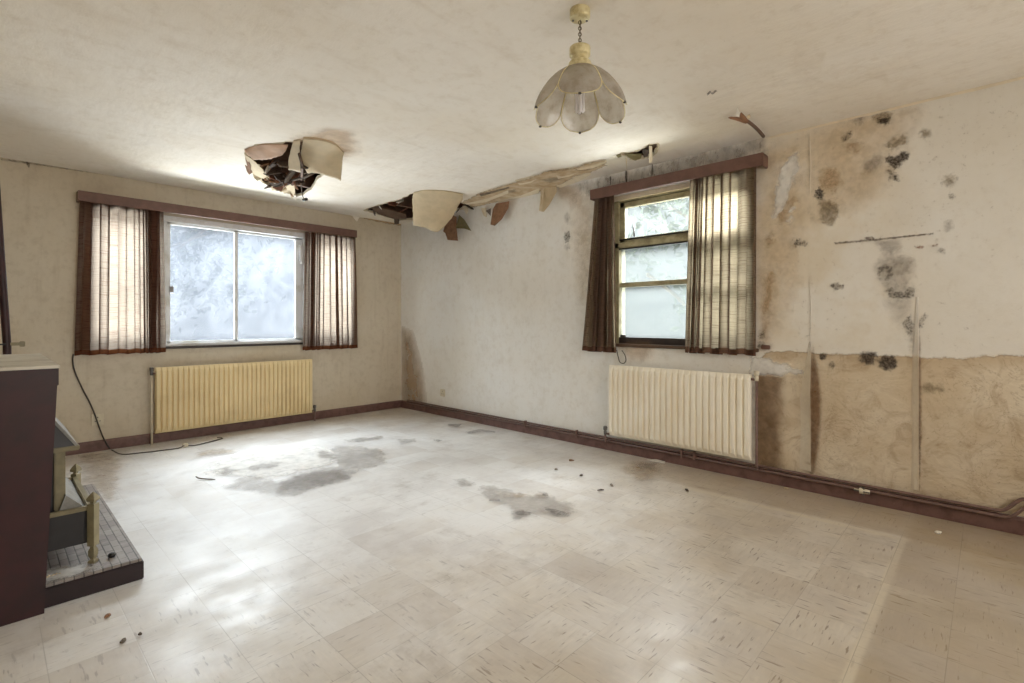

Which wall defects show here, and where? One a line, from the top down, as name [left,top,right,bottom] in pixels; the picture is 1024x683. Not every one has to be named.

leakage [886,140,909,181]
peeling [774,156,798,216]
leakage [815,187,838,223]
crack [835,233,933,244]
flaking render [749,358,820,469]
leakage [212,446,335,477]